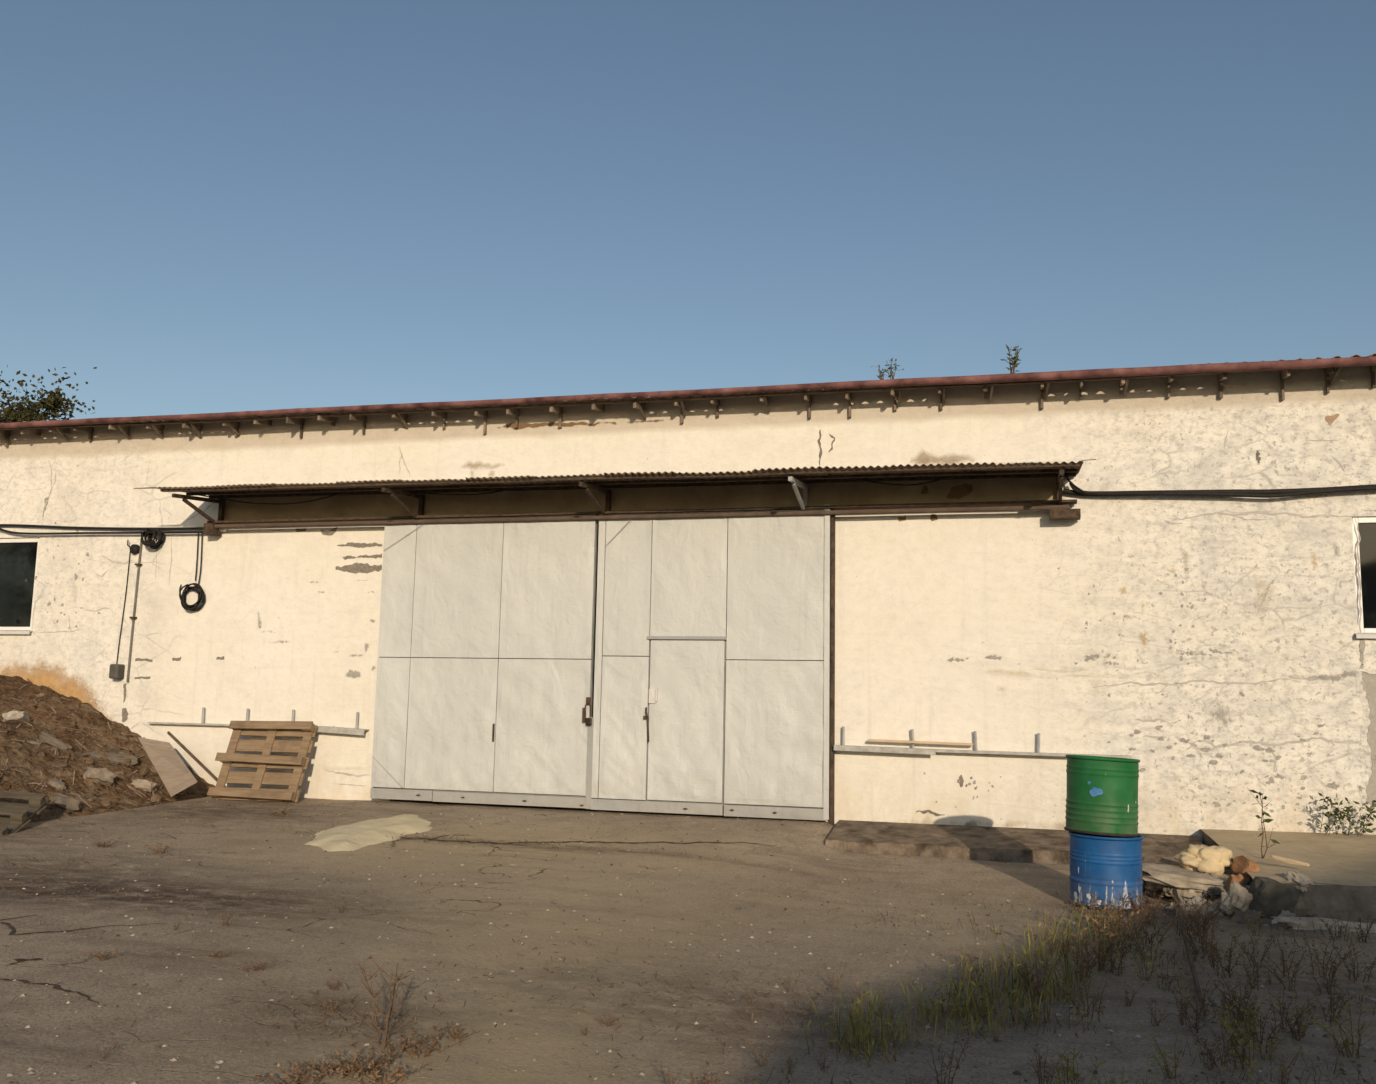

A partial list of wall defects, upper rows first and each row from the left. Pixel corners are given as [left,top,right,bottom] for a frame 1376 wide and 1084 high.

peeling [295,527,382,574]
peeling [1129,724,1343,830]
spalling [1311,638,1376,831]